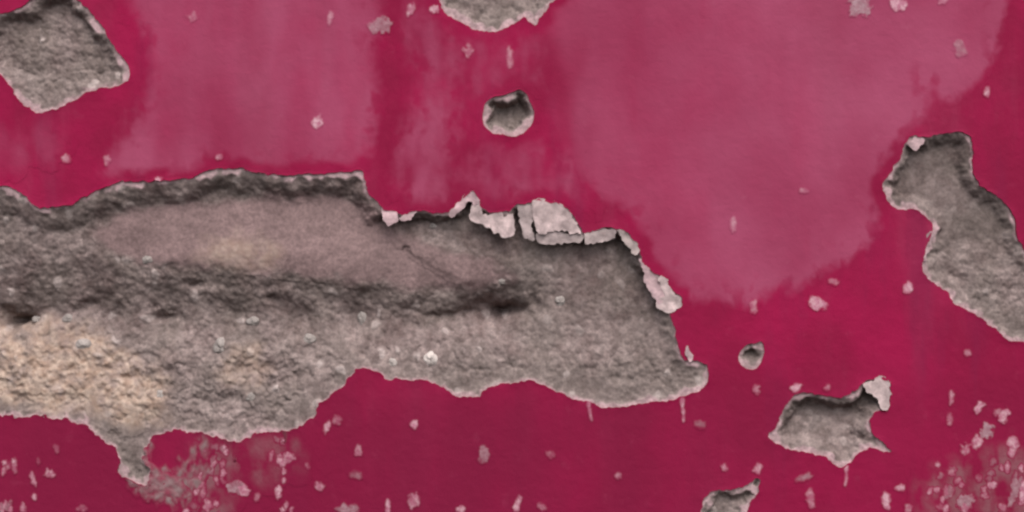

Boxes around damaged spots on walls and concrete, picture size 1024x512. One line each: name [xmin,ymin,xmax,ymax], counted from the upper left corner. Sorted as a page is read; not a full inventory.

spalling [0,0,130,113]
spalling [366,0,554,35]
spalling [482,90,534,137]
spalling [882,132,1024,341]
spalling [0,153,709,512]
spalling [738,341,764,370]
spalling [768,376,892,468]
spalling [701,461,764,512]